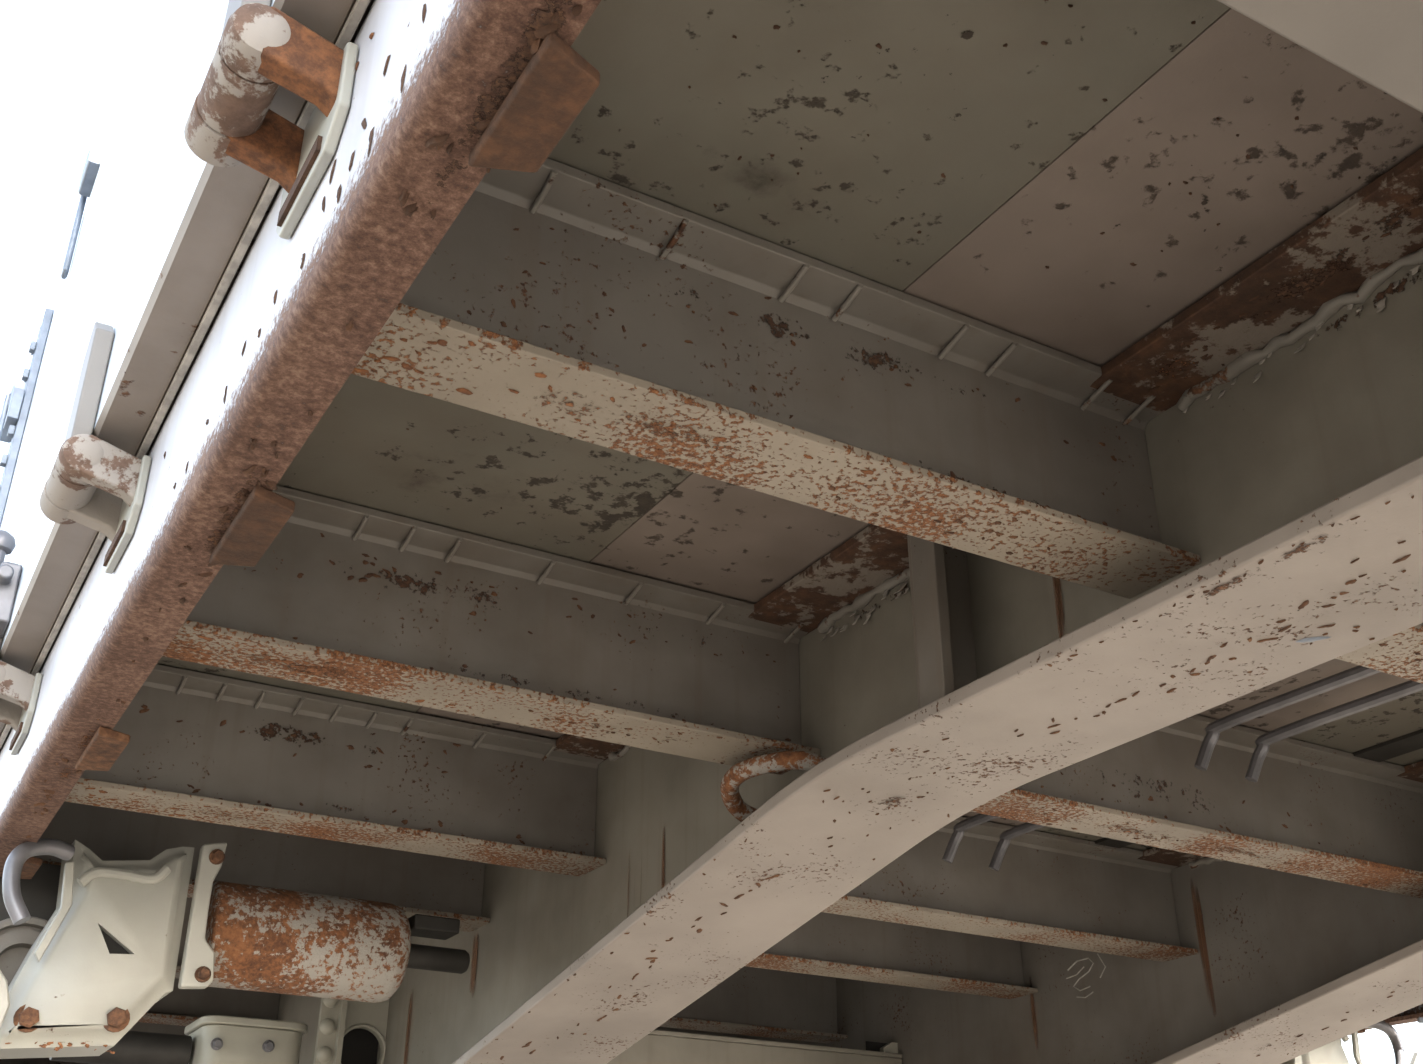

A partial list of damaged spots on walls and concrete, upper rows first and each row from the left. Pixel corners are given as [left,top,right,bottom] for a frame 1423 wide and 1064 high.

corrosion [399,0,583,221]
corrosion [758,297,809,346]
corrosion [353,338,457,375]
corrosion [534,373,615,422]
corrosion [616,415,742,464]
corrosion [178,438,278,604]
corrosion [982,501,1050,555]
corrosion [329,554,501,616]
corrosion [220,720,325,757]
corrosion [1042,770,1292,872]
corrosion [719,874,780,915]
corrosion [557,937,673,1039]